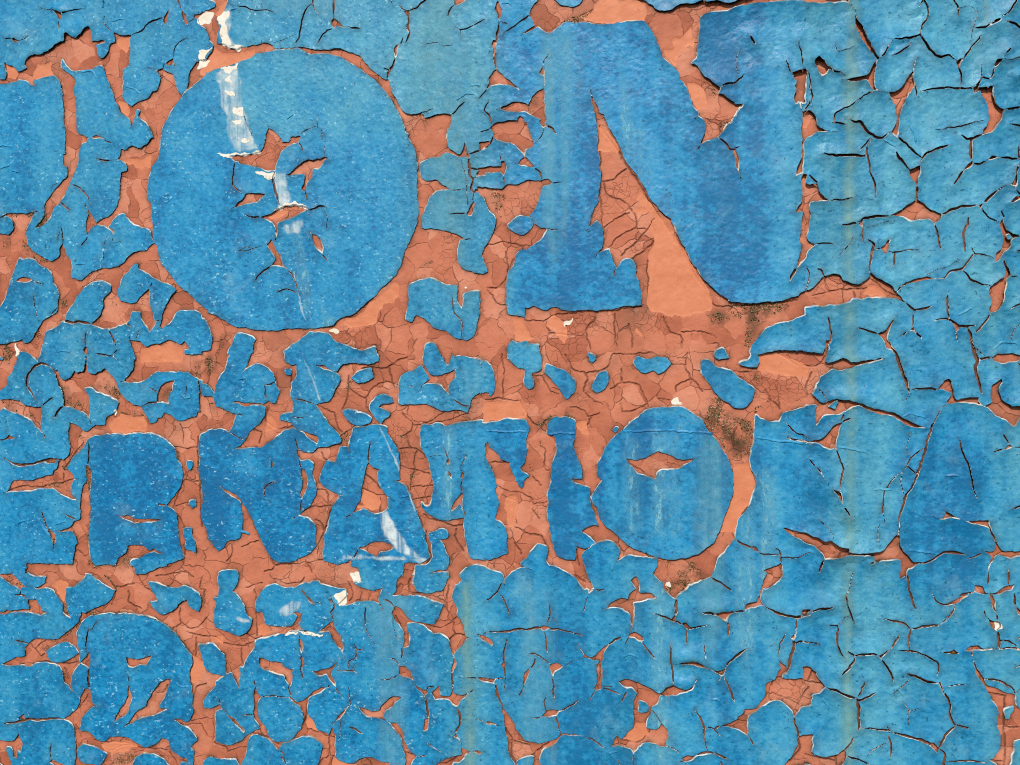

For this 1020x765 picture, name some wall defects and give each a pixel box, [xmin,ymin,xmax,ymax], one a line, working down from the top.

crack [295,0,360,45]
crack [391,0,485,46]
crack [805,0,1020,350]
peeling [0,0,932,616]
crack [858,318,910,400]
peeling [912,211,1020,452]
peeling [0,348,494,765]
crack [486,581,583,689]
peeling [467,577,697,765]
peeling [715,661,889,765]
crack [675,411,986,765]
peeling [934,512,1020,765]